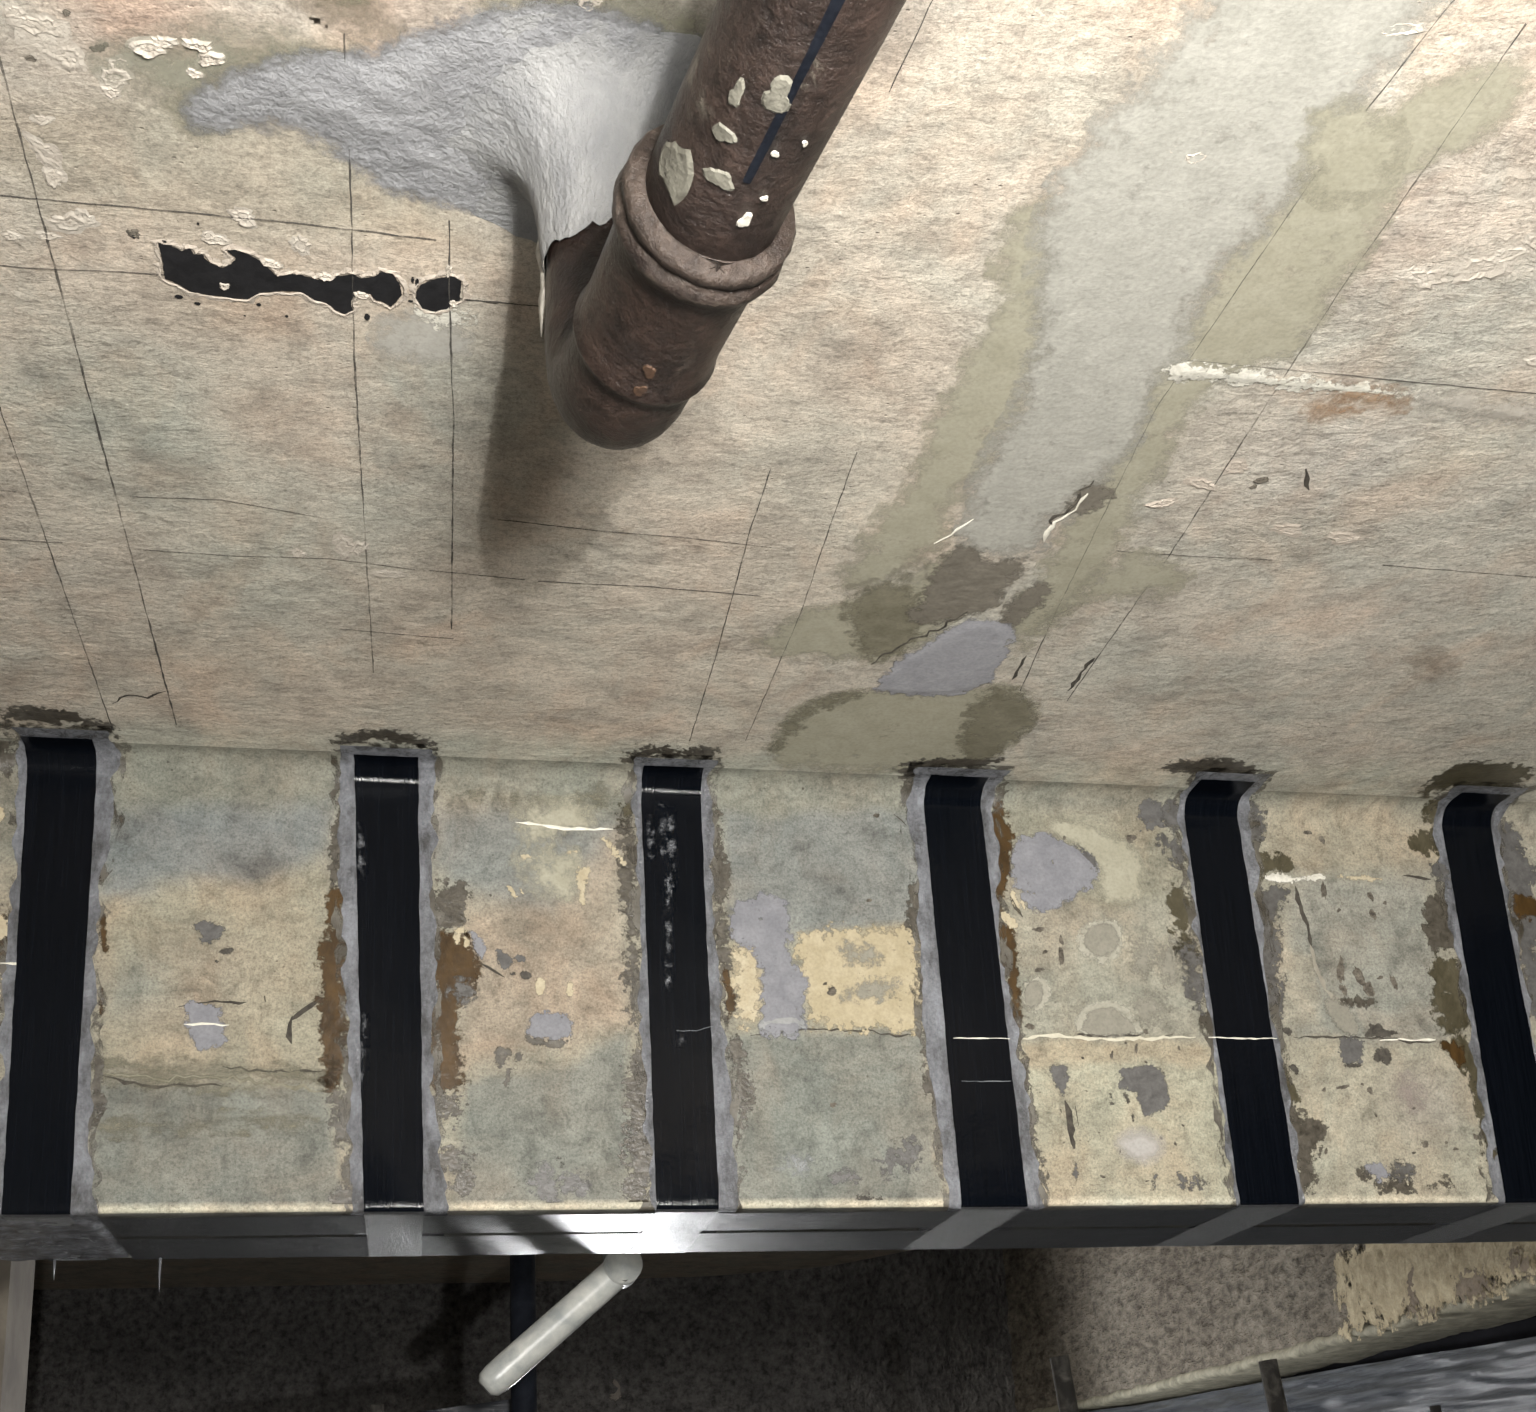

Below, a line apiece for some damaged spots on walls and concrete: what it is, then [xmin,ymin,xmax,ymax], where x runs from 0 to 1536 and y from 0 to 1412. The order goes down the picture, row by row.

peeling [126,206,479,362]
leakage [761,61,1525,663]
rust [0,740,18,779]
leakage [769,684,1038,820]
leakage [904,881,921,944]
rust [313,780,352,1164]
rust [431,877,483,1197]
peeling [727,945,765,1032]
peeling [792,921,922,1036]
crack [1023,1031,1195,1042]
peeling [1333,1241,1536,1342]